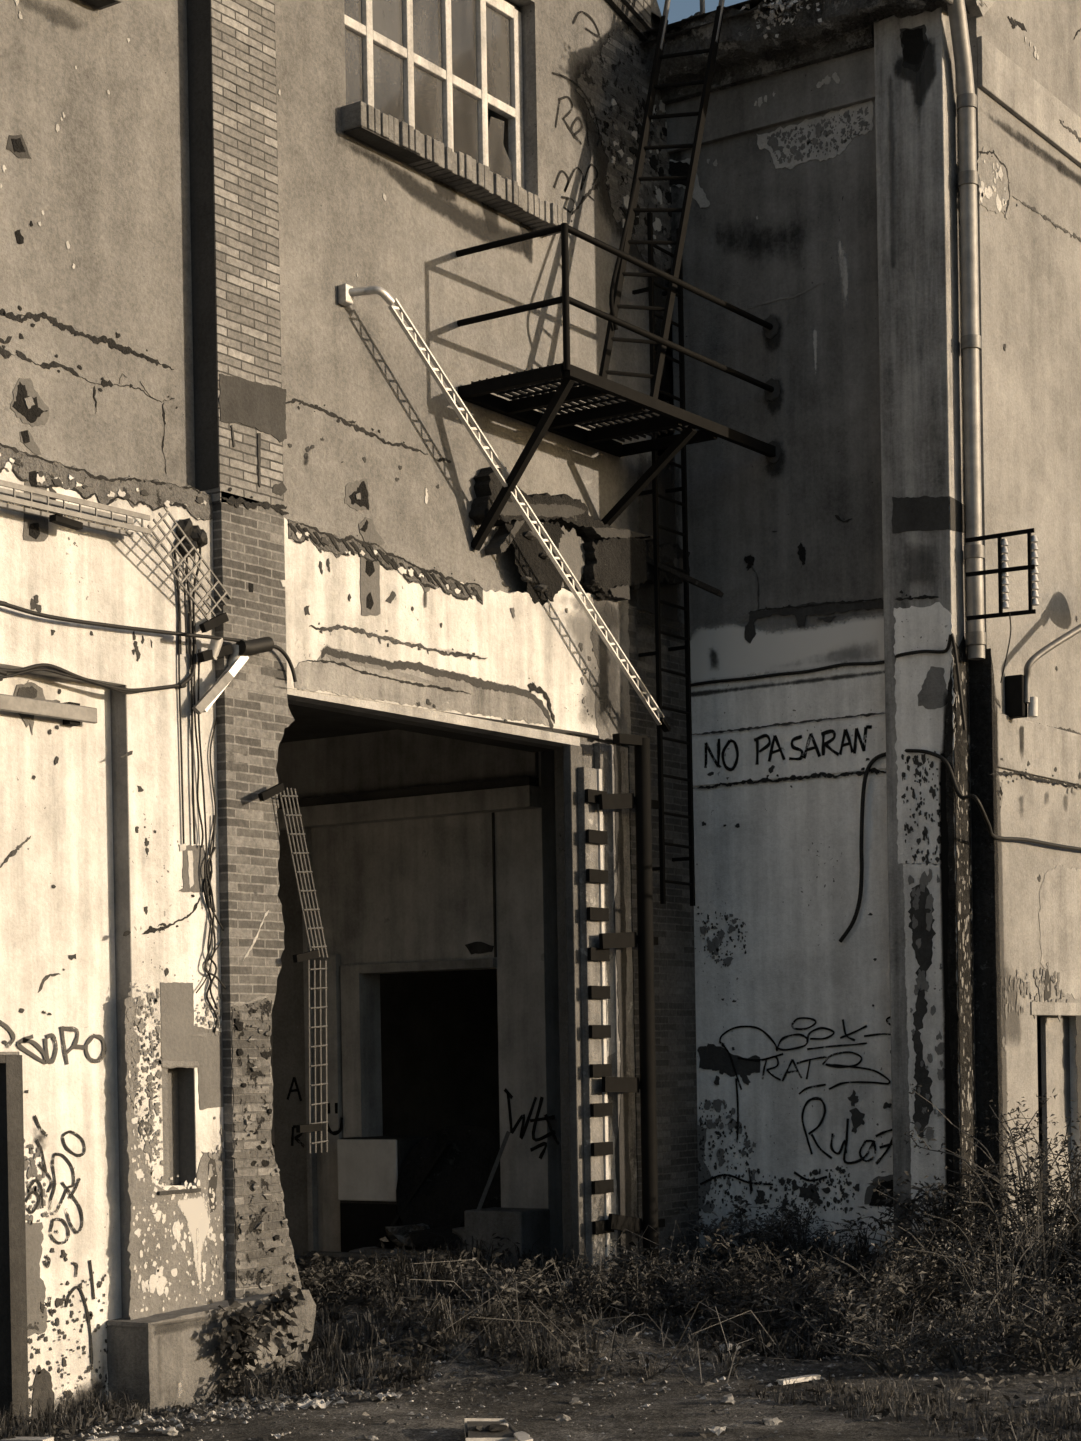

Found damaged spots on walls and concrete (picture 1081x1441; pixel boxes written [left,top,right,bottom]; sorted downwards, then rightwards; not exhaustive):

spalling [576,26,710,271]
peeling [757,100,874,169]
peeling [977,146,1013,219]
crack [0,305,178,474]
spalling [0,378,213,521]
crack [285,398,451,463]
spalling [287,479,483,605]
flaking render [469,467,690,740]
peeling [690,598,956,1231]
peeling [124,968,299,1320]
peeling [24,1139,109,1423]